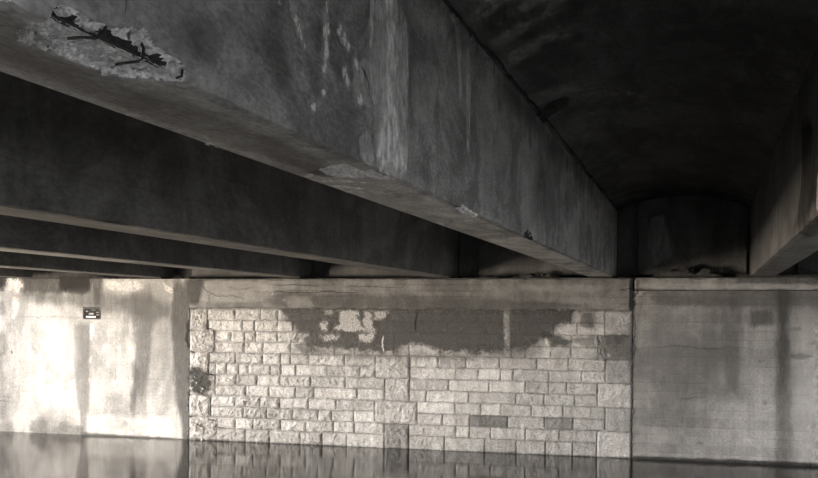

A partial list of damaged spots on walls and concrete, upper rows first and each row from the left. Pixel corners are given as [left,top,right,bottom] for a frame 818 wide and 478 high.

spalling [16,4,186,82]
spalling [319,164,390,180]
water stain [35,278,265,443]
crack [620,278,638,457]
water stain [604,296,818,467]